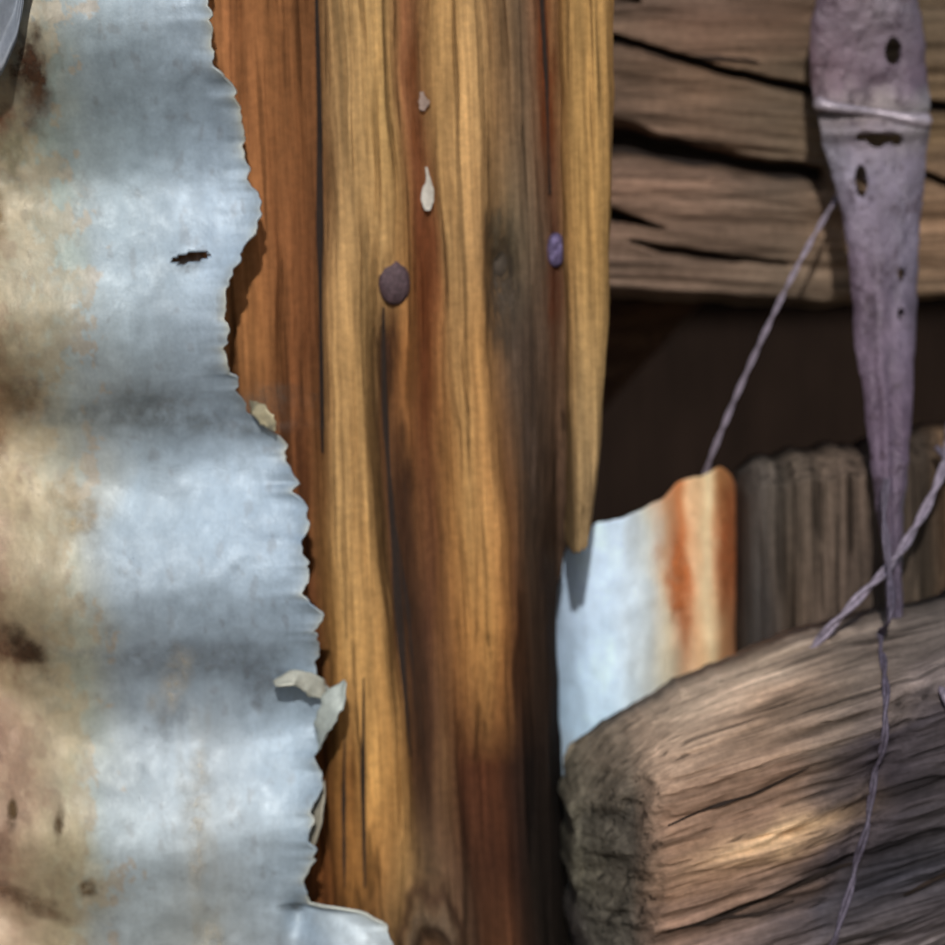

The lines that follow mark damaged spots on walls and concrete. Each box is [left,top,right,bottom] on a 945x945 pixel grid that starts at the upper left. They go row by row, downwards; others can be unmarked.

crack [613,35,813,95]
crack [930,102,945,111]
crack [612,129,821,182]
crack [925,172,945,186]
crack [611,210,785,263]
rust [668,542,690,619]
rust [8,800,17,824]